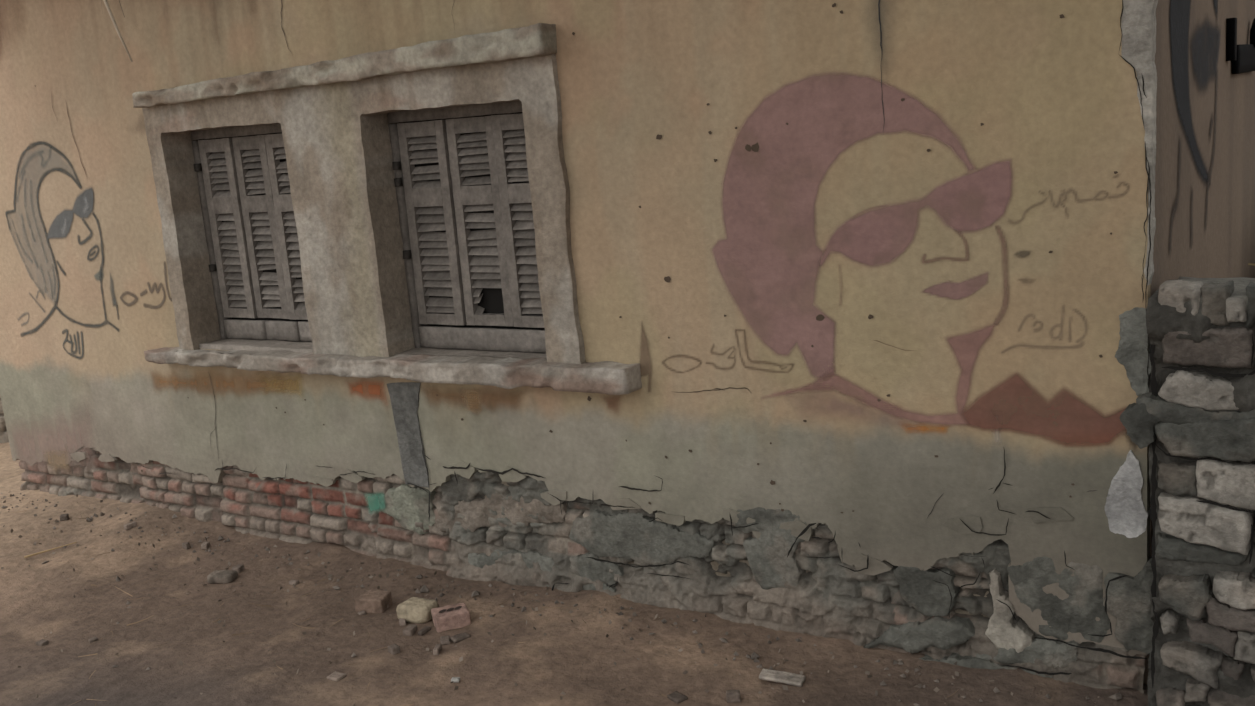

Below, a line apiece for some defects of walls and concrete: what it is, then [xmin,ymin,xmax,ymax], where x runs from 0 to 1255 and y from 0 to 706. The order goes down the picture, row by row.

spalling [19,448,1145,694]
crack [927,439,1255,688]